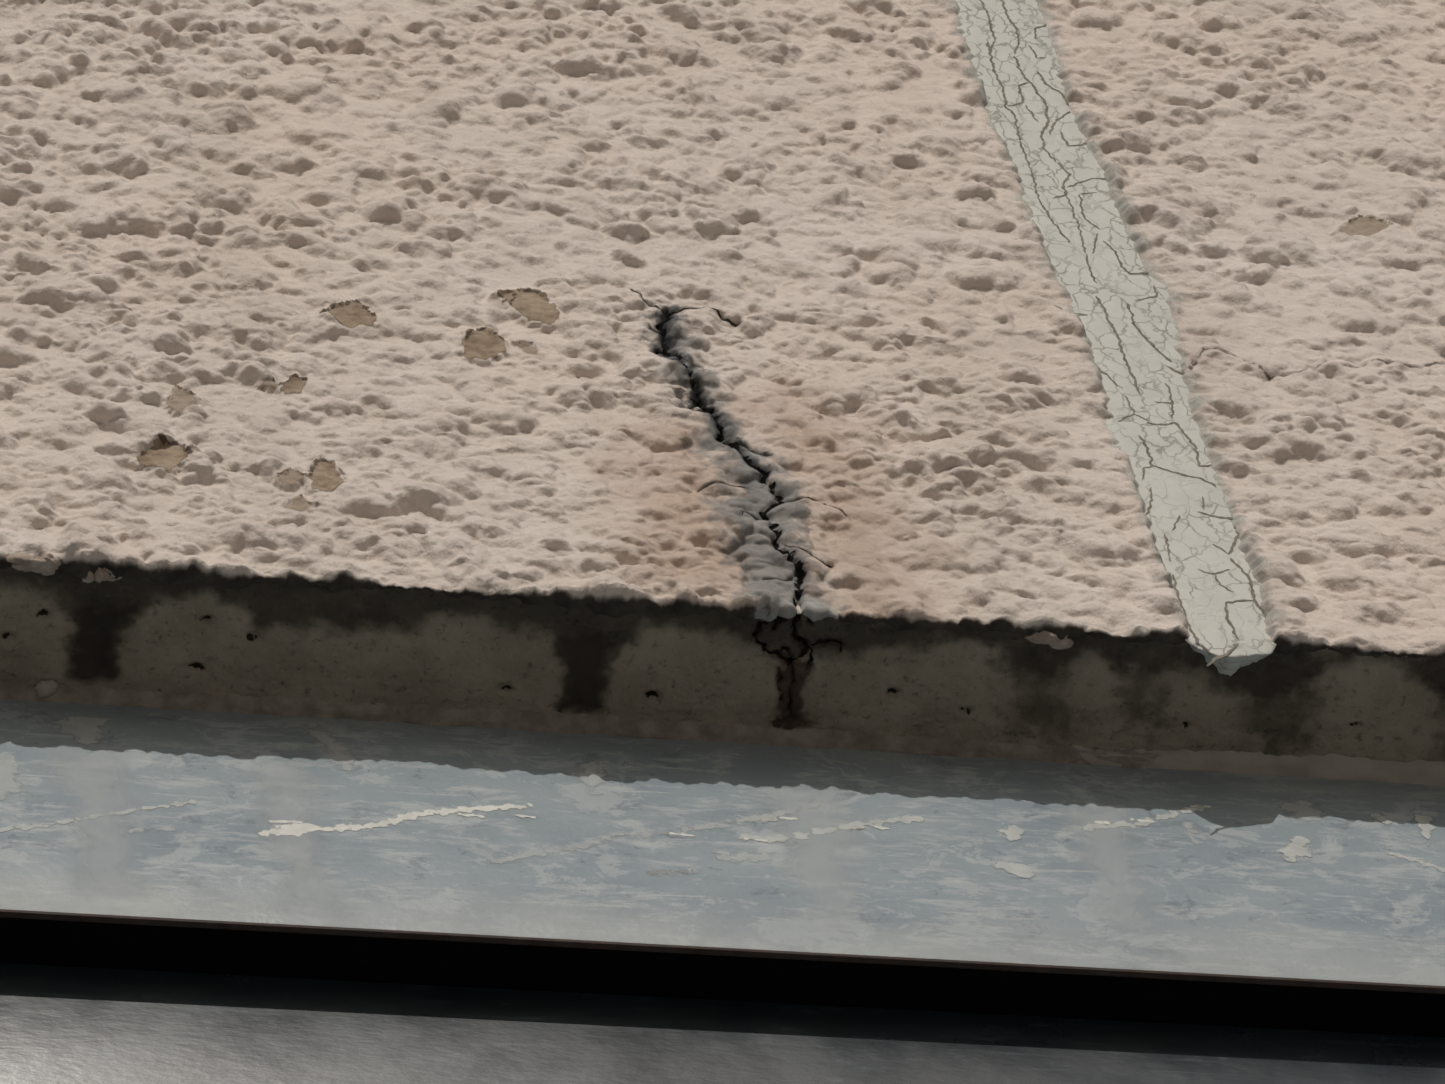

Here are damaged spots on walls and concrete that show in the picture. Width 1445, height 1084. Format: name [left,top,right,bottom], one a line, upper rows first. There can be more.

peeling [1340,215,1393,236]
peeling [319,299,377,328]
peeling [462,327,537,360]
peeling [497,287,560,324]
crack [980,0,1440,666]
peeling [259,373,307,394]
peeling [137,433,193,473]
peeling [277,458,346,511]
damp [0,307,1445,709]
crack [630,289,846,716]
spalling [6,551,61,576]
peeling [1276,800,1321,862]